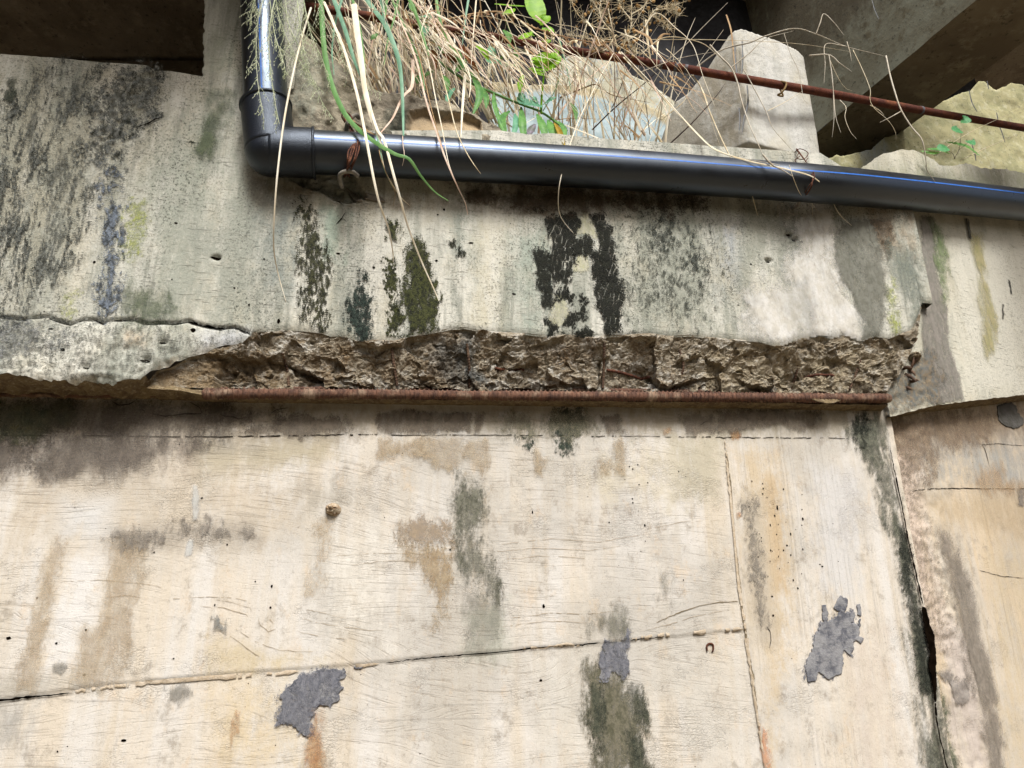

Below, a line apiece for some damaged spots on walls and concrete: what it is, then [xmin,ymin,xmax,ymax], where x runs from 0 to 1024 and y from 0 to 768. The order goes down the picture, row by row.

mould [0,51,132,332]
mould [292,194,443,343]
peeling [572,254,589,273]
peeling [576,213,599,240]
water stain [529,192,889,345]
crack [22,317,249,334]
spalling [140,293,922,404]
water stain [852,412,871,449]
peeling [822,595,864,644]
water stain [899,525,933,695]